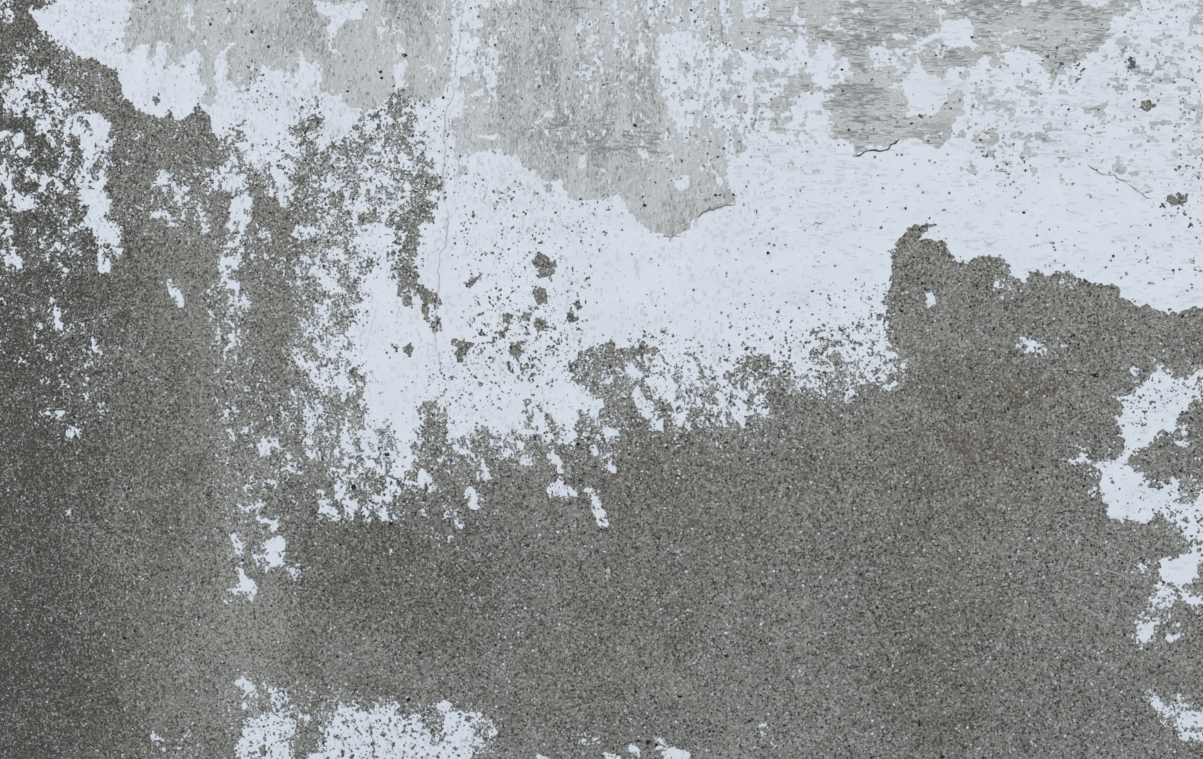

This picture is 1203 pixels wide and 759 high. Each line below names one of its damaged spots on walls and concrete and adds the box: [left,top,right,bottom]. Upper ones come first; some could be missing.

peeling [181,0,324,105]
peeling [1159,158,1203,242]